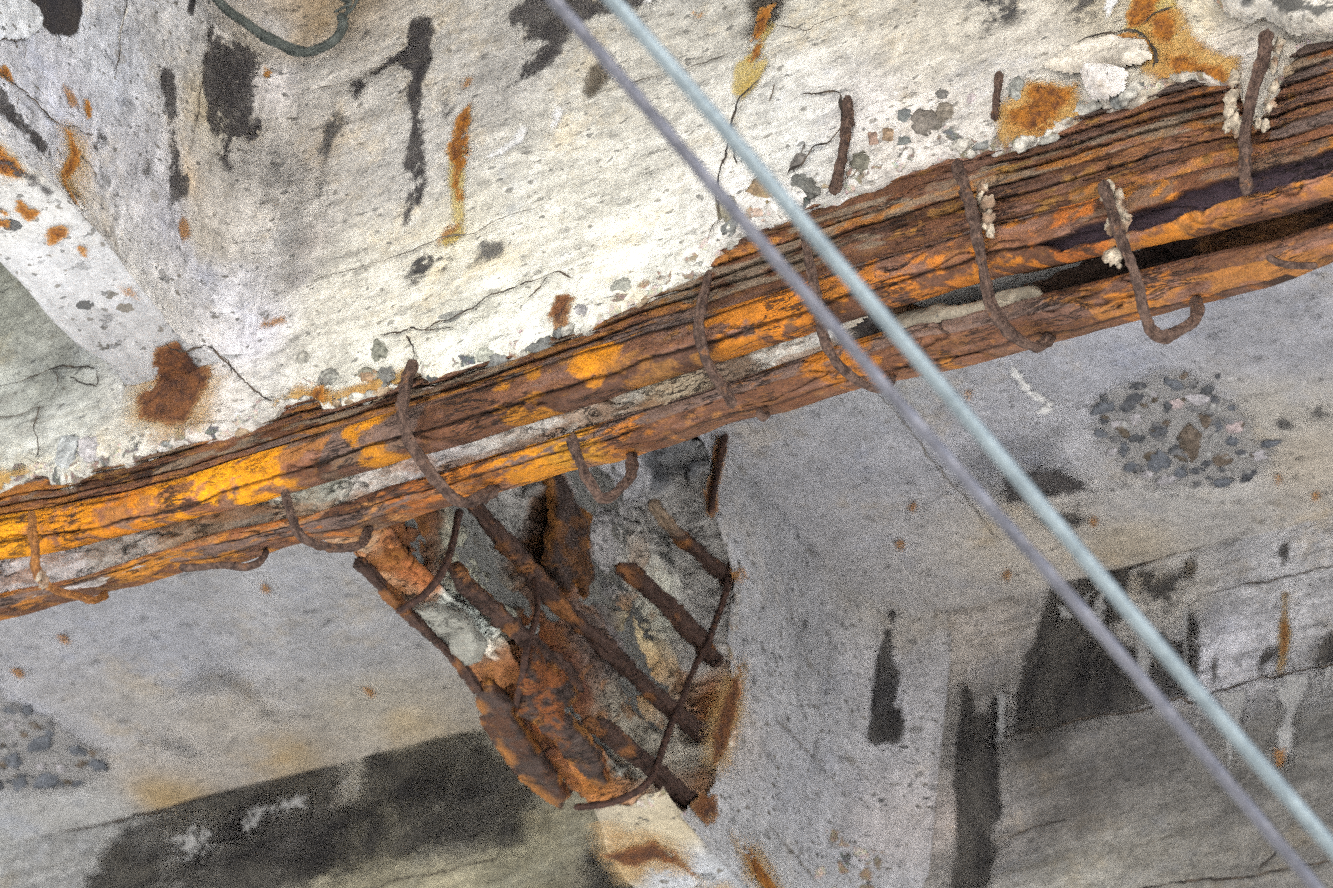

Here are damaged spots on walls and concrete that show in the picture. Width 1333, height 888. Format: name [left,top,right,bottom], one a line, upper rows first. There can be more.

peeling [31,0,83,36]
corrosion [1117,0,1238,83]
leakage [350,16,436,226]
corrosion [997,82,1079,147]
spalling [1021,201,1333,293]
crack [373,271,571,359]
corrosion [136,341,211,427]
crack [165,343,273,401]
spalling [0,315,884,598]
spalling [325,440,742,813]
leakage [949,560,1246,888]
leakage [84,737,530,888]